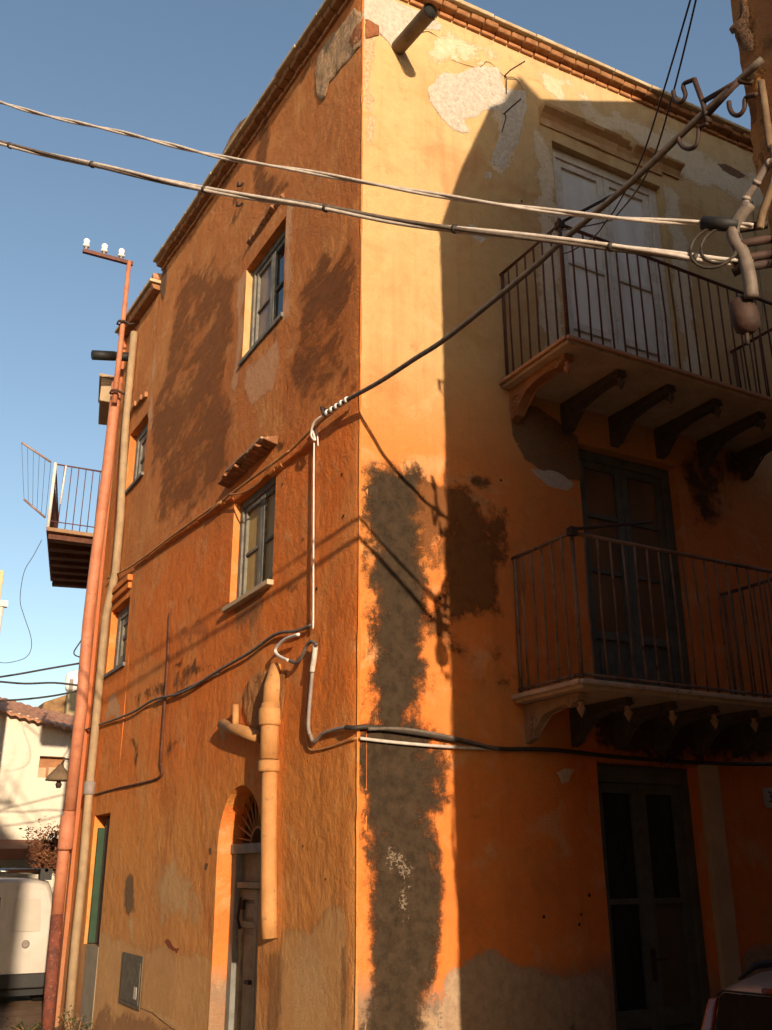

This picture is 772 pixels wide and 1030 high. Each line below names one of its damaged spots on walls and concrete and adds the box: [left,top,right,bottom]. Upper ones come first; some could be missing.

leakage [151,257,234,520]
leakage [291,245,356,398]
spalling [315,0,419,146]
spalling [425,20,565,348]
peeling [538,70,764,207]
peeling [663,183,703,375]
leakage [359,462,509,1030]